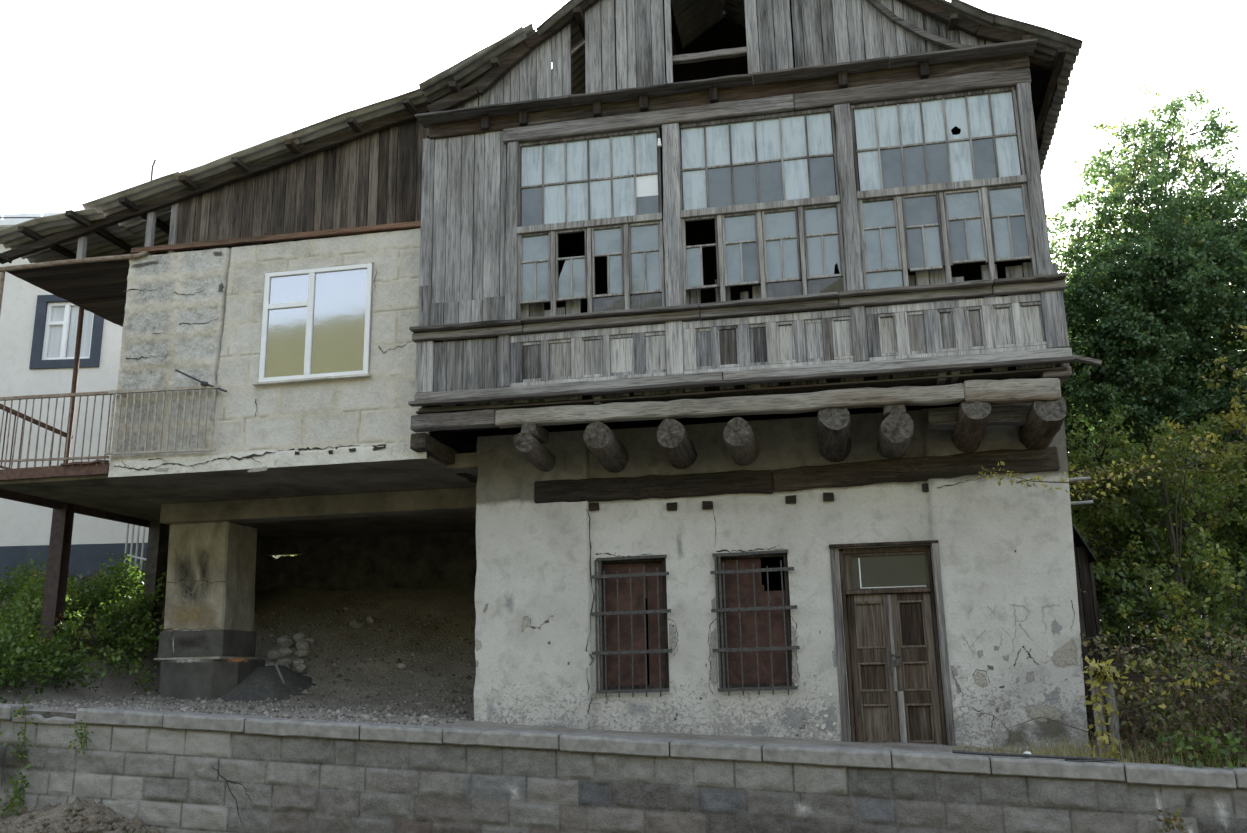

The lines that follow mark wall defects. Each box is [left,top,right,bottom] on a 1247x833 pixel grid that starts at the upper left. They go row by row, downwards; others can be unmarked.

flaking render [1047,620,1077,668]
crack [1071,600,1084,679]
spalling [950,646,1034,716]
flaking render [1026,686,1065,723]